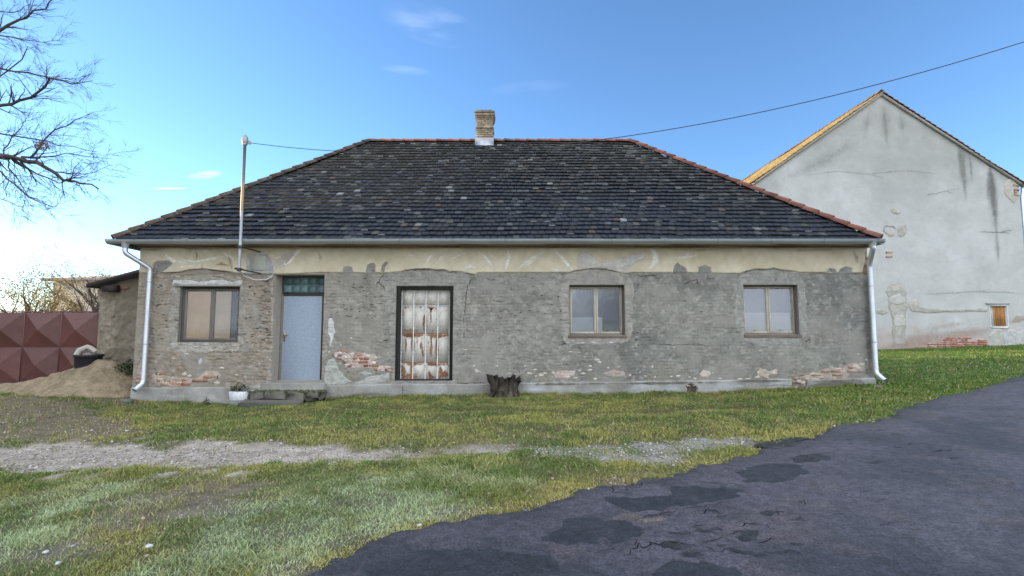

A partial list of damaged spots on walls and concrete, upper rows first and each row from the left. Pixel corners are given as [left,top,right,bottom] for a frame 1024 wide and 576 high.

leakage [931,131,1004,262]
flaking render [153,261,243,285]
spalling [577,252,646,273]
flaking render [136,343,240,387]
flaking render [328,318,395,371]
rust [401,306,448,379]
flaking render [792,353,869,388]
spalling [876,283,988,350]